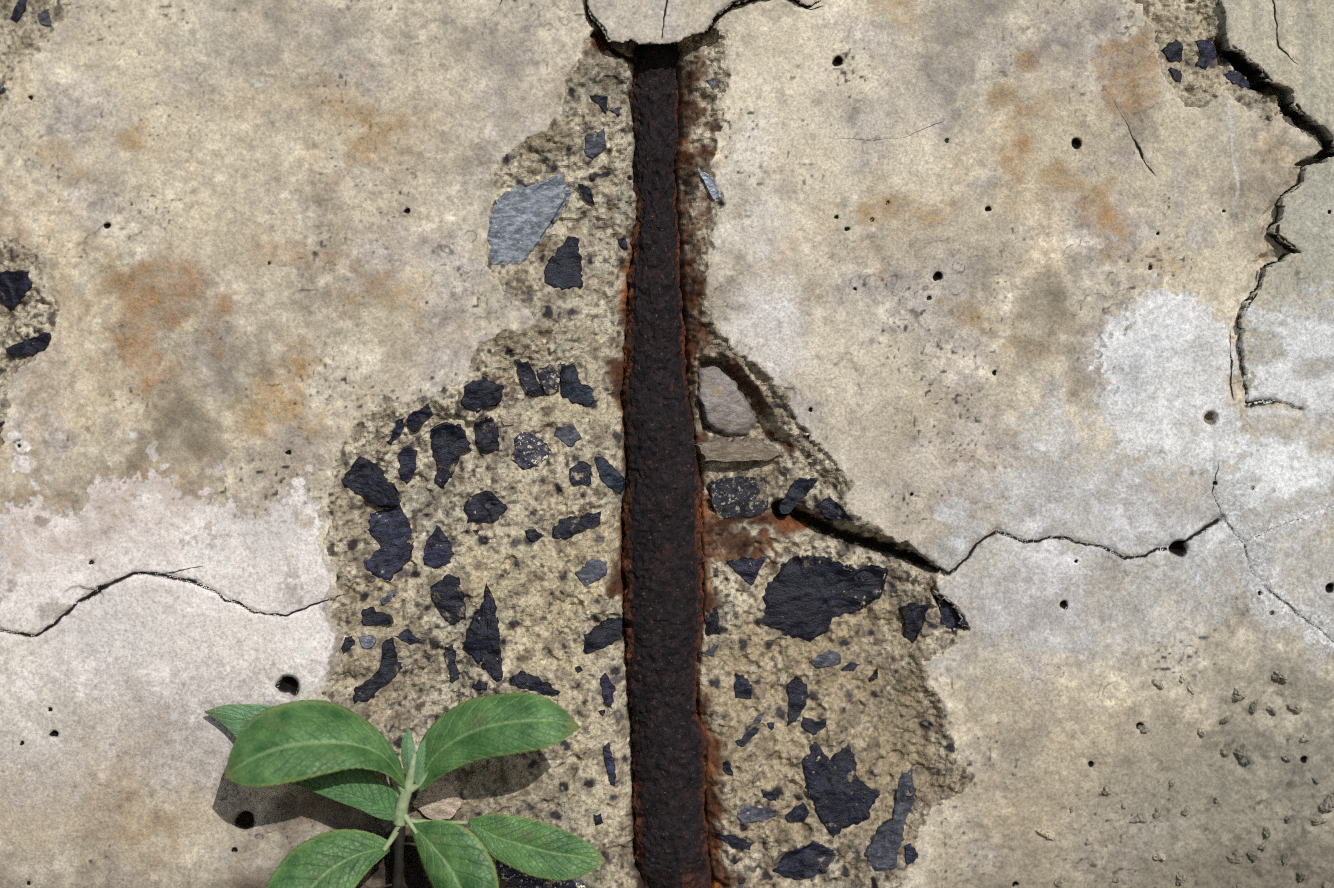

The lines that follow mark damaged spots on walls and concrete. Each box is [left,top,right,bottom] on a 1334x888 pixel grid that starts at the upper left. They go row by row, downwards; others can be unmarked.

corrosion [591,29,609,52]
crack [702,0,757,36]
crack [1220,0,1334,158]
corrosion [674,57,796,454]
flaking render [1129,0,1334,402]
crack [1230,273,1277,408]
spalling [0,0,975,888]
damp [934,273,1334,658]
crack [0,566,341,637]
corrosion [700,498,811,622]
crack [789,466,1334,642]
corrosion [696,694,737,888]